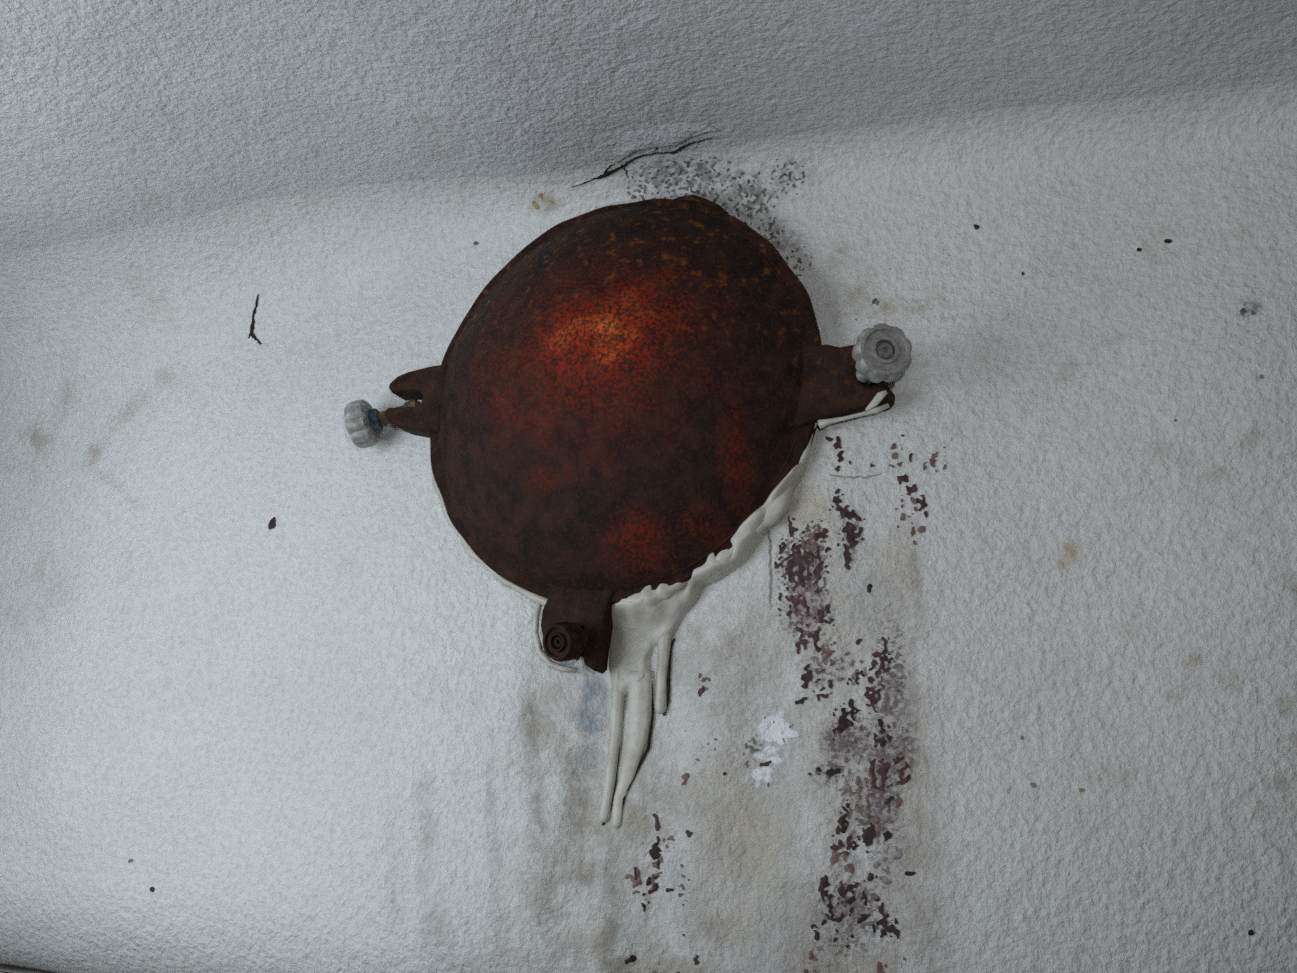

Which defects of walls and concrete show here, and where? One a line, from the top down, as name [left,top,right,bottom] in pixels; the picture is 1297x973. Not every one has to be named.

crack [572,122,720,187]
leakage [626,157,812,277]